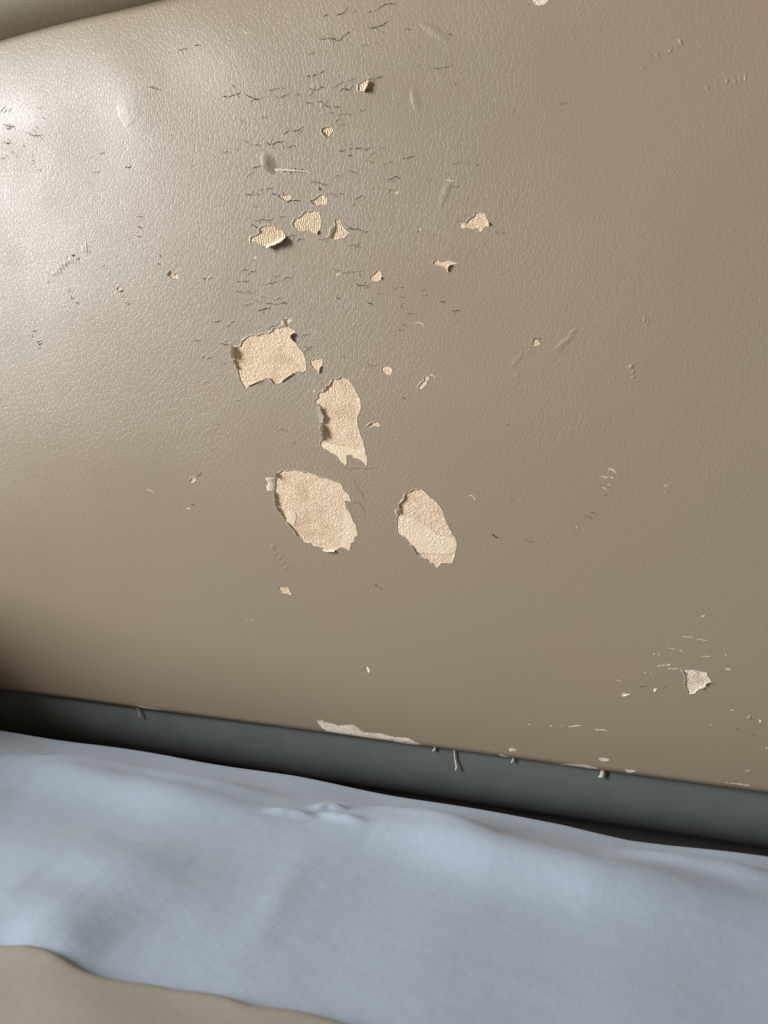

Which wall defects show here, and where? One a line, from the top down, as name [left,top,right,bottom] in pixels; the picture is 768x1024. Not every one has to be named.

crack [177,44,200,55]
peeling [249,192,350,260]
crack [194,2,462,384]
peeling [458,211,490,233]
peeling [230,317,381,467]
peeling [266,468,359,552]
peeling [395,487,458,570]
peeling [644,647,715,696]
peeling [317,719,423,745]